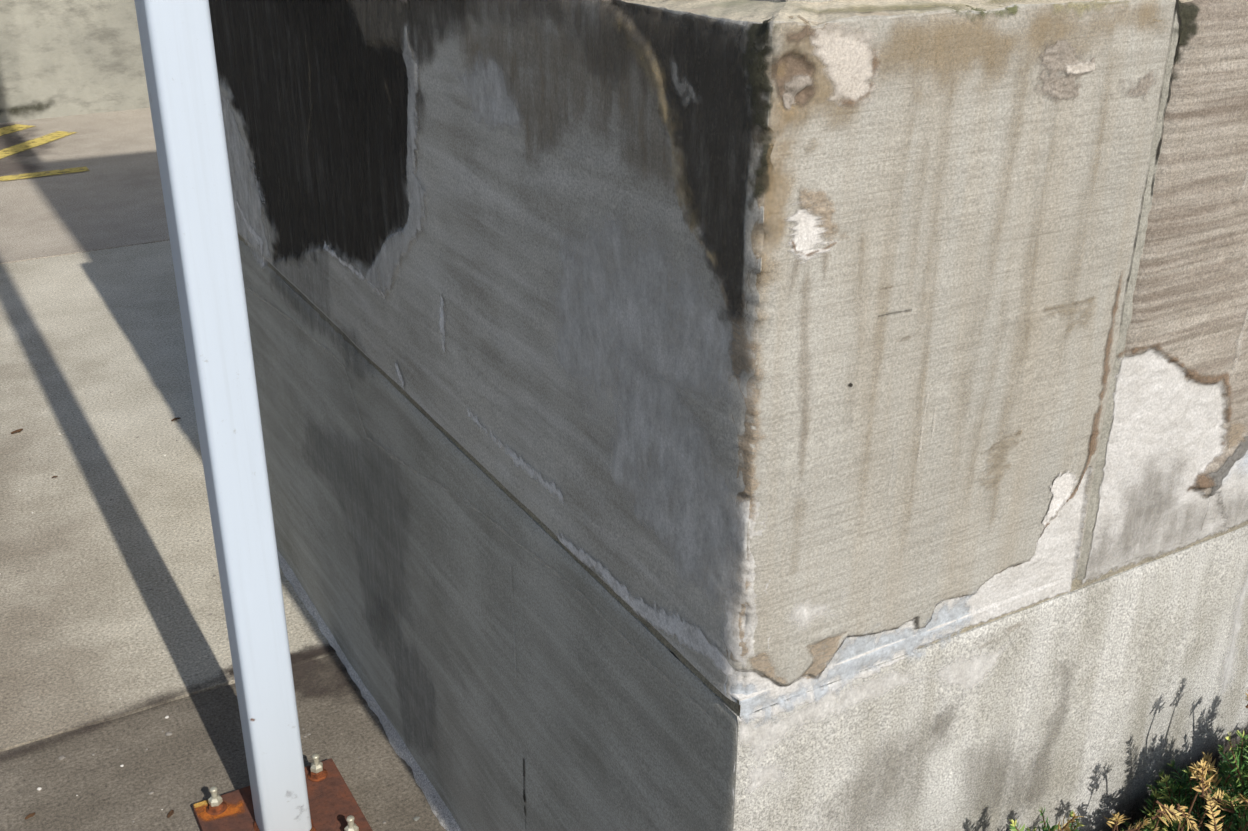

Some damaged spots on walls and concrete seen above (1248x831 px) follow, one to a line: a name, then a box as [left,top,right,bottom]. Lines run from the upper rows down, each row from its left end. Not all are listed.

damp [209,0,757,267]
damp [809,64,844,101]
damp [558,225,736,597]
spalling [613,2,1248,722]